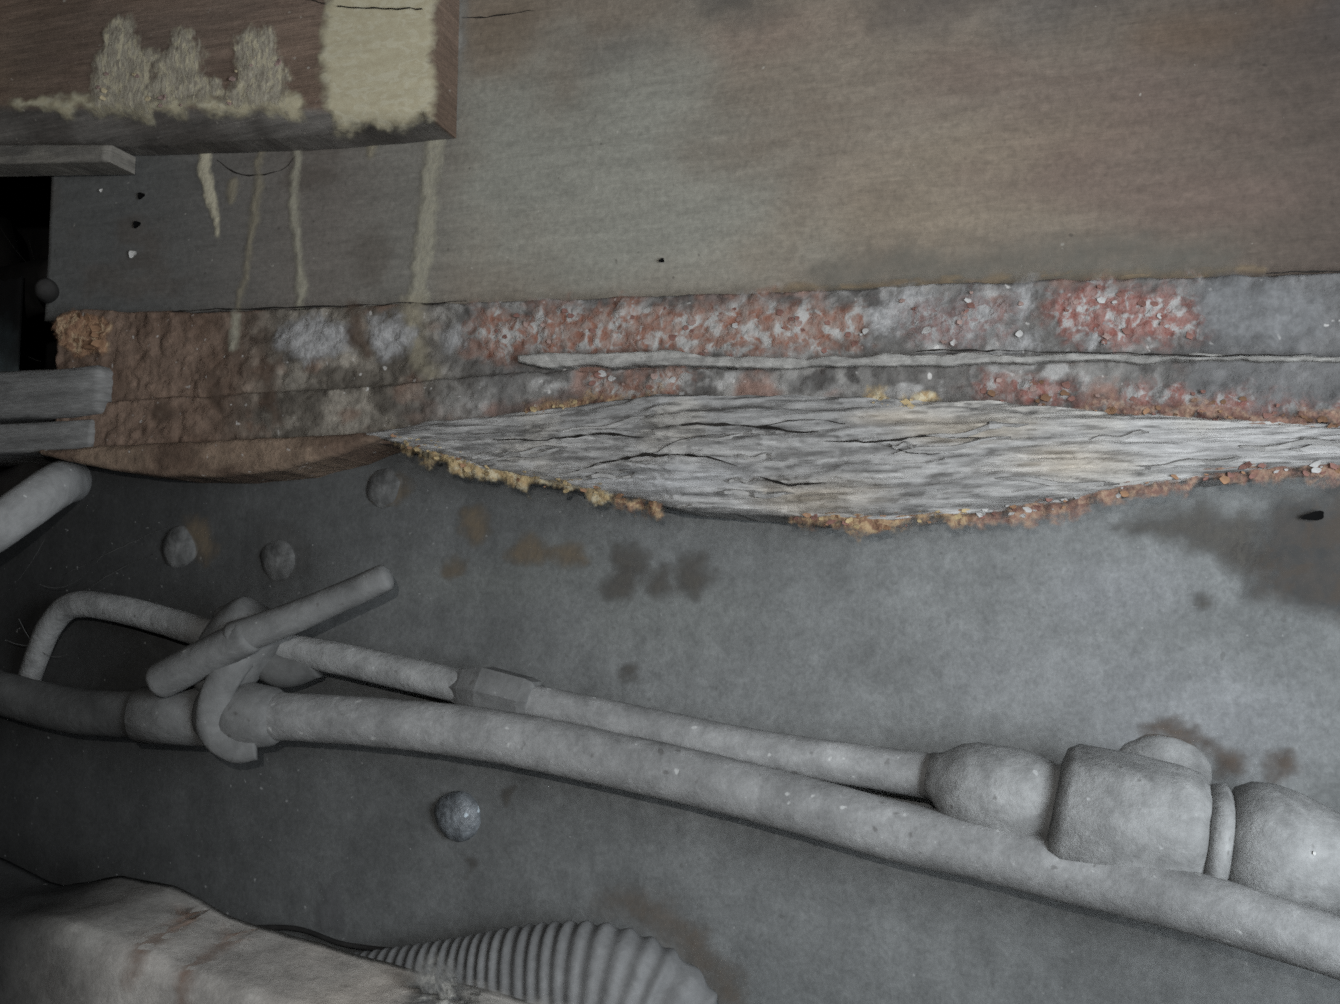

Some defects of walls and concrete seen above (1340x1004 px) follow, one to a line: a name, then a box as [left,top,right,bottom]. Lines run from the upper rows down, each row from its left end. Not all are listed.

damp [198,153,237,235]
damp [229,152,263,350]
damp [289,150,307,310]
damp [405,139,444,380]
corrosion [524,390,623,415]
corrosion [866,387,937,409]
peeling [973,373,1309,421]
corrosion [1077,397,1340,428]
crack [494,419,982,486]